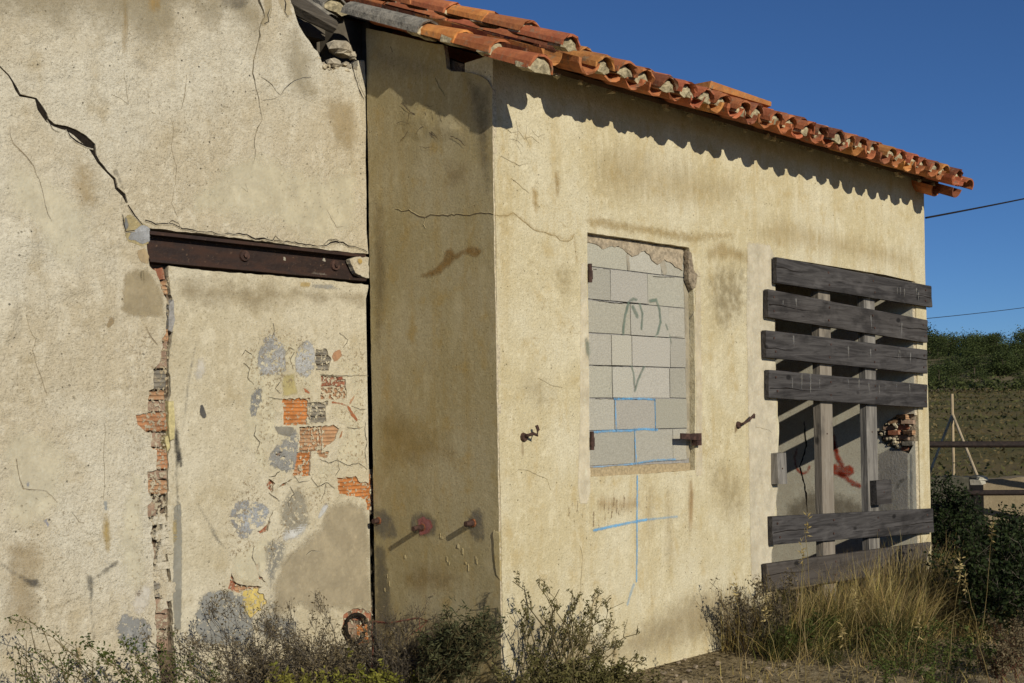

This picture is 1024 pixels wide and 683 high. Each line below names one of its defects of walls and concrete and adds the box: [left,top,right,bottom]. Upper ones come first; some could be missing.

crack [258,0,292,40]
crack [8,75,367,253]
crack [395,123,575,242]
flaking render [121,214,176,683]
flaking render [230,331,373,557]
flaking render [877,414,917,453]
flaking render [228,563,266,617]